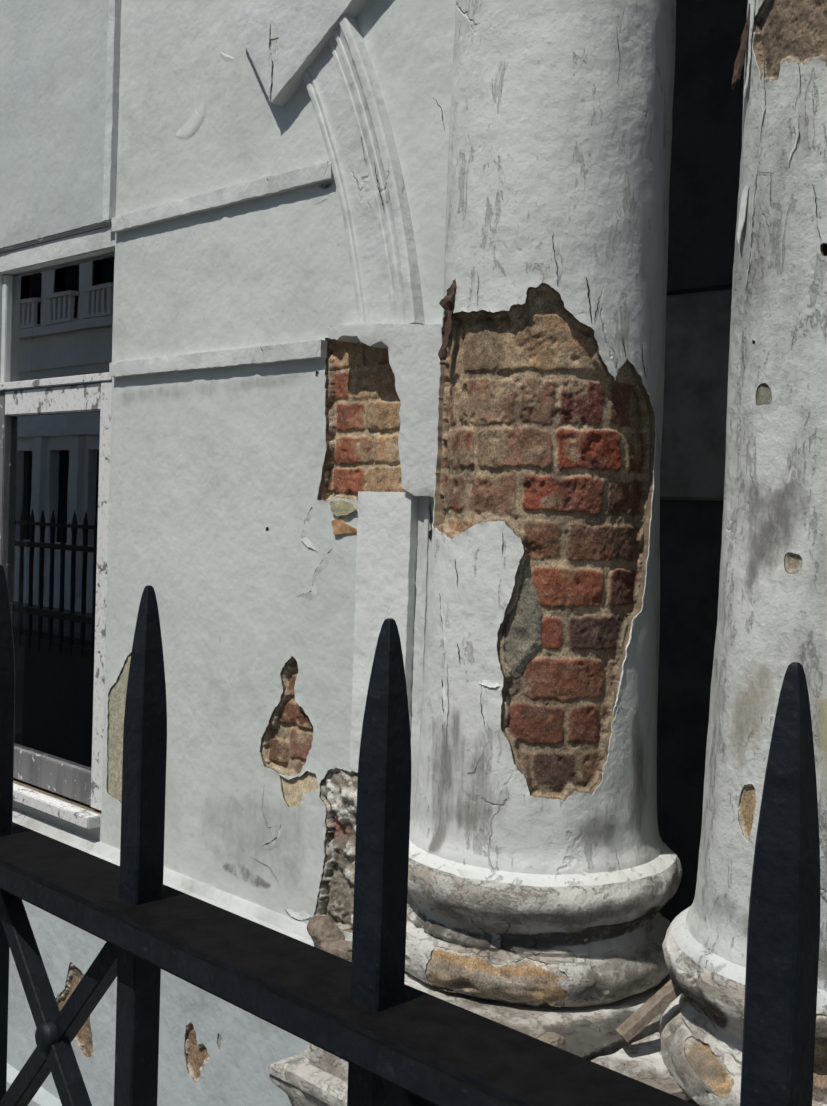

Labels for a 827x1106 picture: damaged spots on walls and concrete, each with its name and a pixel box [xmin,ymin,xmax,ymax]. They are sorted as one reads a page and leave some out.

crack [265,24,273,101]
peeling [731,0,827,97]
flaking render [317,338,408,535]
flaking render [438,279,651,800]
peeling [108,654,131,802]
flaking render [262,657,358,930]
peeling [738,784,756,842]
flaking render [56,962,84,1011]
peeling [426,947,569,1006]
flaking render [73,1016,94,1058]
flaking render [185,1022,222,1082]
peeling [812,1009,827,1106]